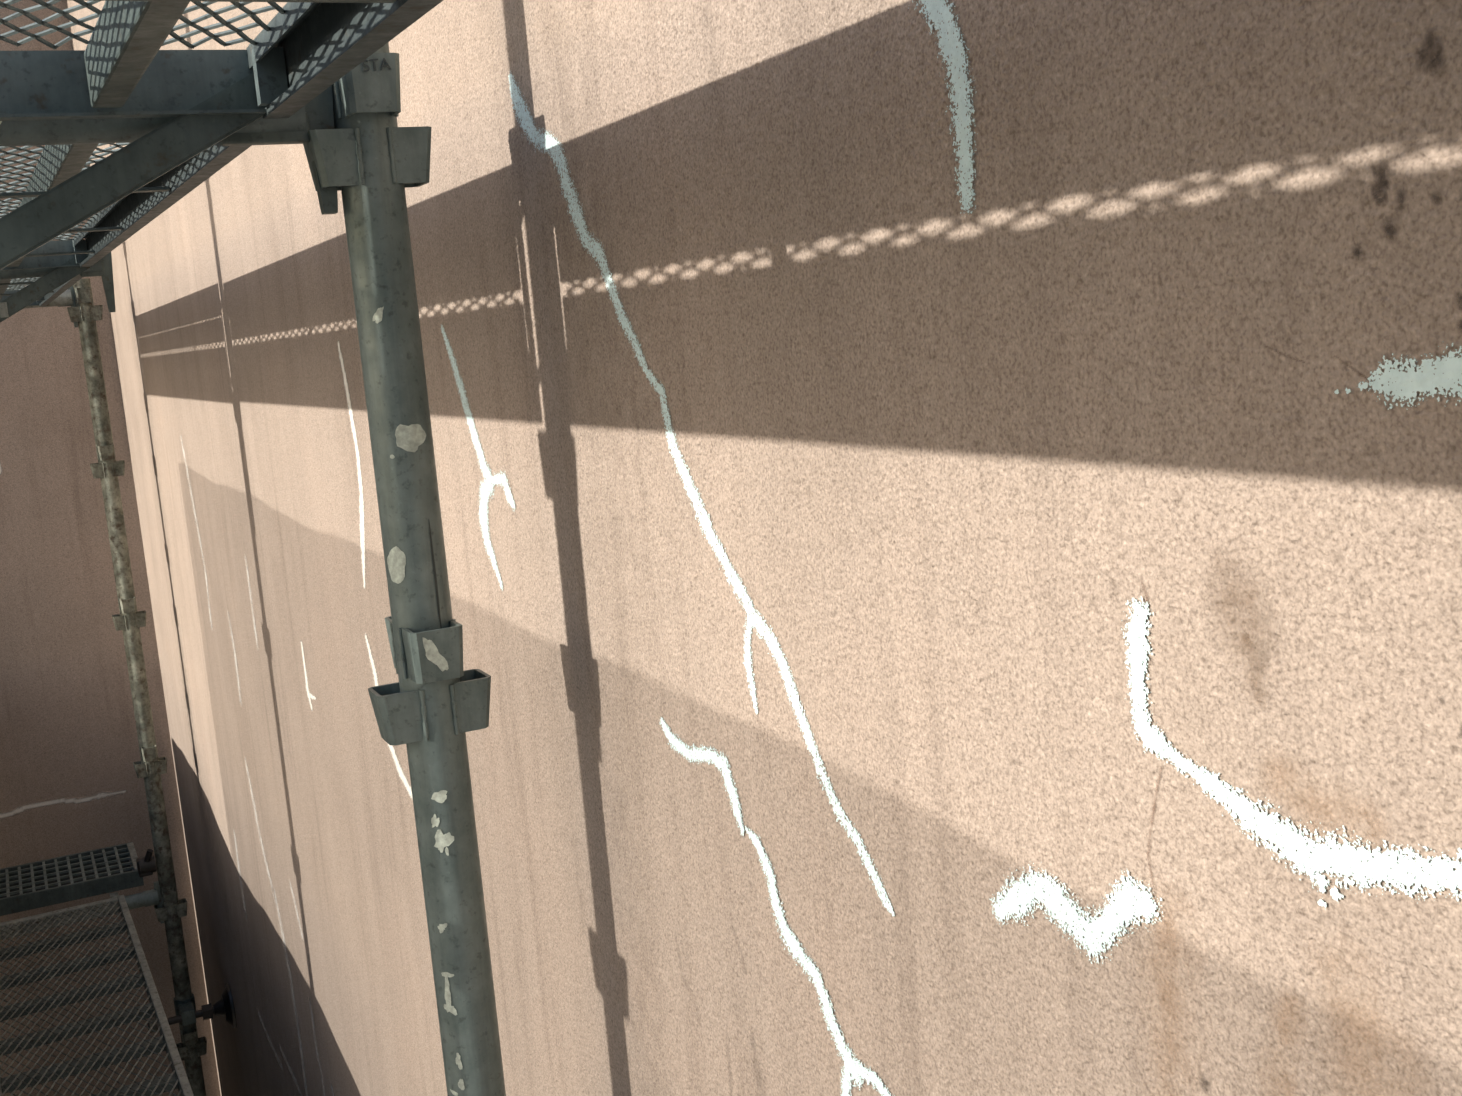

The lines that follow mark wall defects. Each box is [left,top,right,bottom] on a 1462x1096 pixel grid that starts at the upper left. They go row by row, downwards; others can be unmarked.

crack [908,0,977,217]
water stain [1373,168,1403,202]
crack [440,325,516,590]
crack [508,71,895,916]
crack [1334,343,1462,410]
crack [1121,596,1462,908]
crack [659,717,895,1096]
crack [989,861,1164,964]